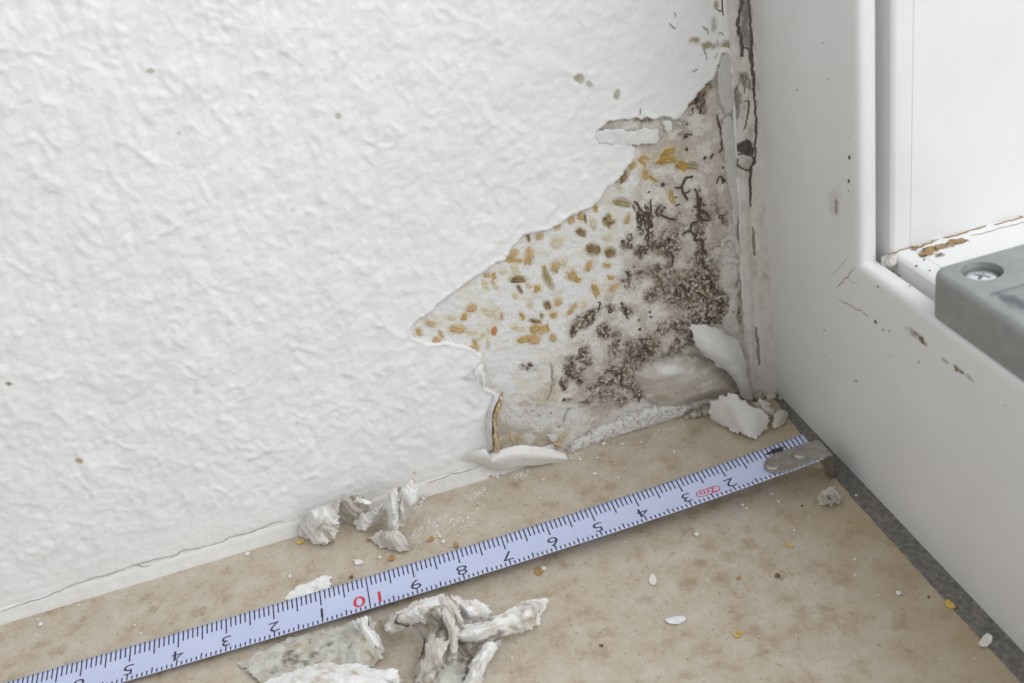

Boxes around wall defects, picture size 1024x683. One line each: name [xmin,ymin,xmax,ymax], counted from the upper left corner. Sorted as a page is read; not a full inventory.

peeling [410,52,753,469]
leakage [526,176,741,427]
crack [1,521,282,612]